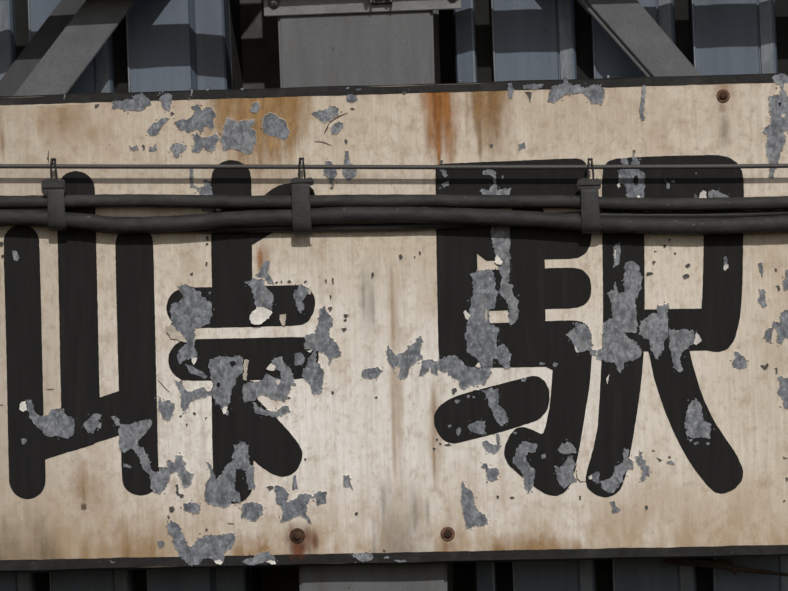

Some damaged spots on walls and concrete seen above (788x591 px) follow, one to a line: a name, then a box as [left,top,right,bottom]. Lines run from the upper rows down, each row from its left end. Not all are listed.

peeling [110,88,291,159]
rust [424,92,452,164]
peeling [763,73,788,179]
peeling [244,260,312,326]
peeling [361,226,580,494]
peeling [565,238,702,384]
peeling [758,288,767,308]
peeling [763,309,788,346]
peeling [19,272,349,567]
peeling [684,398,715,445]
peeling [343,474,353,490]
peeling [589,447,675,514]